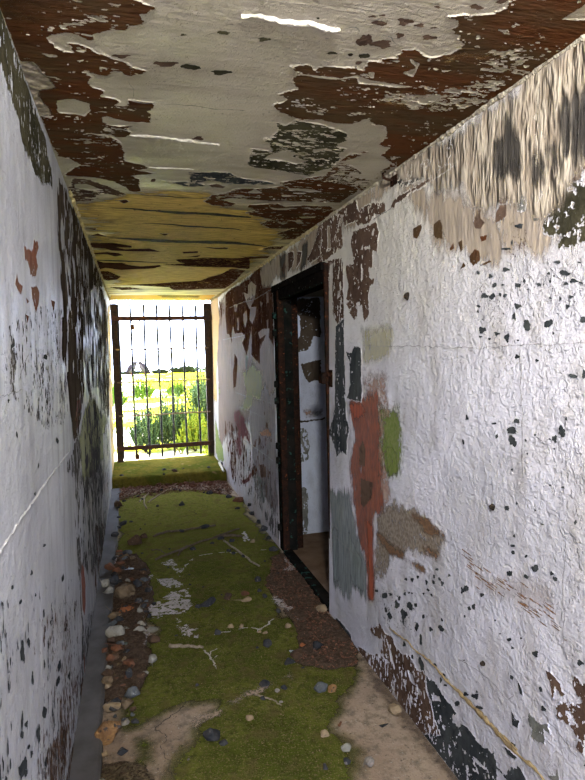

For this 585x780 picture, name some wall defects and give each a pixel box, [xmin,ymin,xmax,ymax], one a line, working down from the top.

peeling [151,0,585,462]
damp [356,41,585,265]
peeling [0,0,279,780]
peeling [334,568,527,780]
peeling [510,659,585,755]